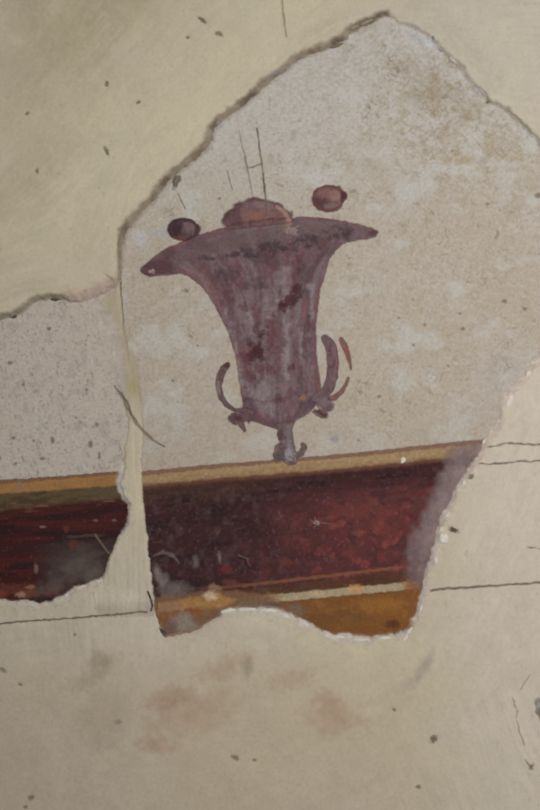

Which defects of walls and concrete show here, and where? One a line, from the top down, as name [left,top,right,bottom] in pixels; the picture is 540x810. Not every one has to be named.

spalling [0,11,389,319]
spalling [0,577,103,609]
spalling [221,607,314,627]
spalling [323,349,540,644]